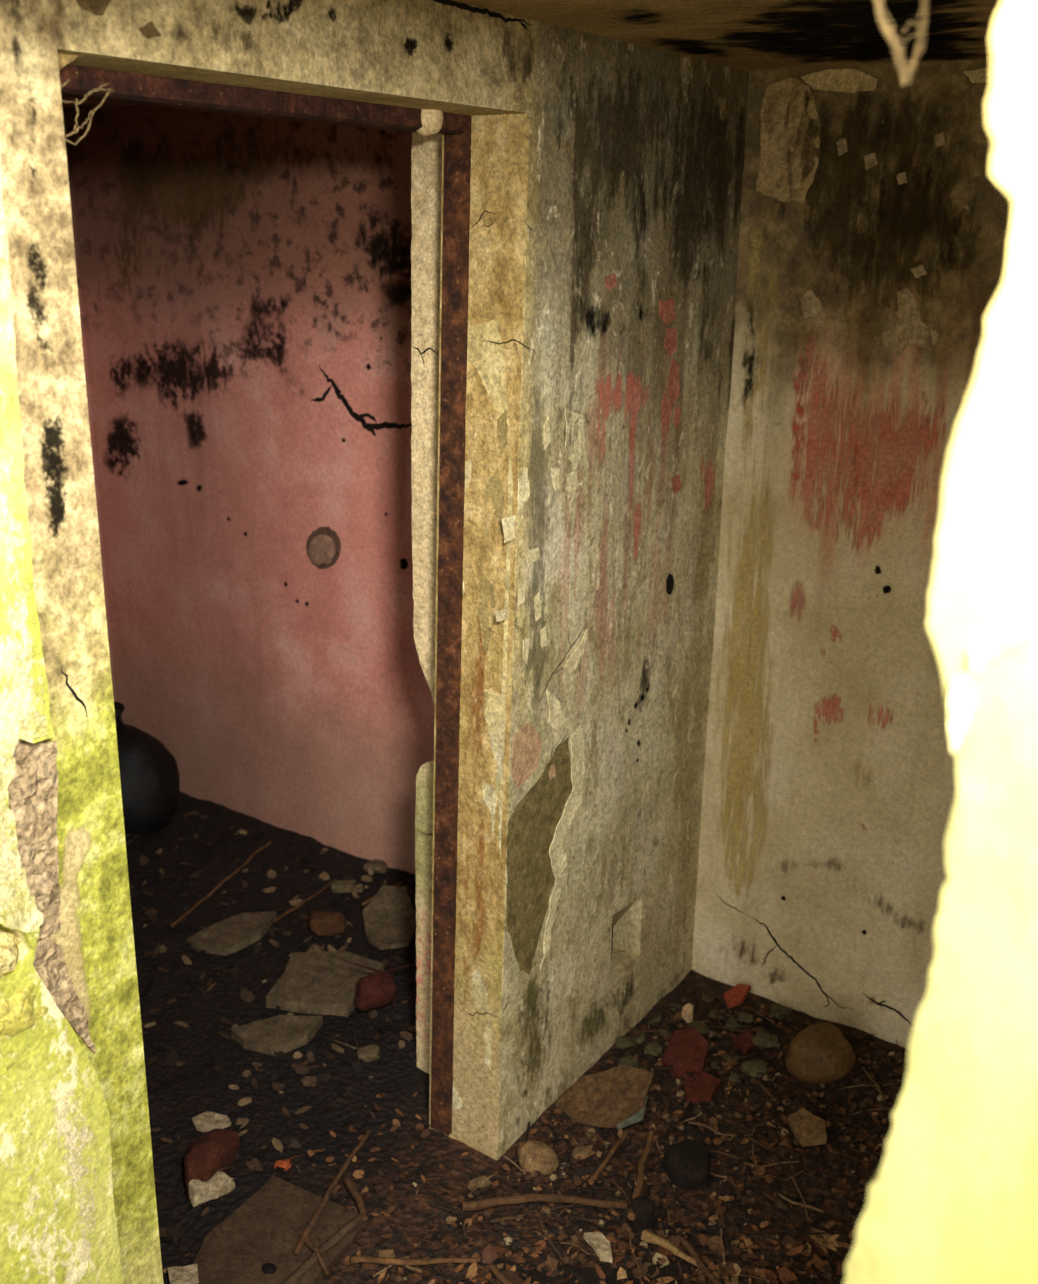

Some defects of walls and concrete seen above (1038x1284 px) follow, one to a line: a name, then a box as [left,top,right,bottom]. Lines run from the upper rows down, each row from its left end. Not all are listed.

peeling [756,69,878,203]
water stain [27,244,49,350]
water stain [110,299,288,448]
crack [311,366,412,436]
water stain [360,215,412,305]
peeling [882,264,940,356]
water stain [42,418,68,536]
water stain [525,395,547,720]
spalling [0,504,96,1053]
peeling [506,689,586,975]
crack [717,895,913,1026]
peeling [56,1090,95,1262]